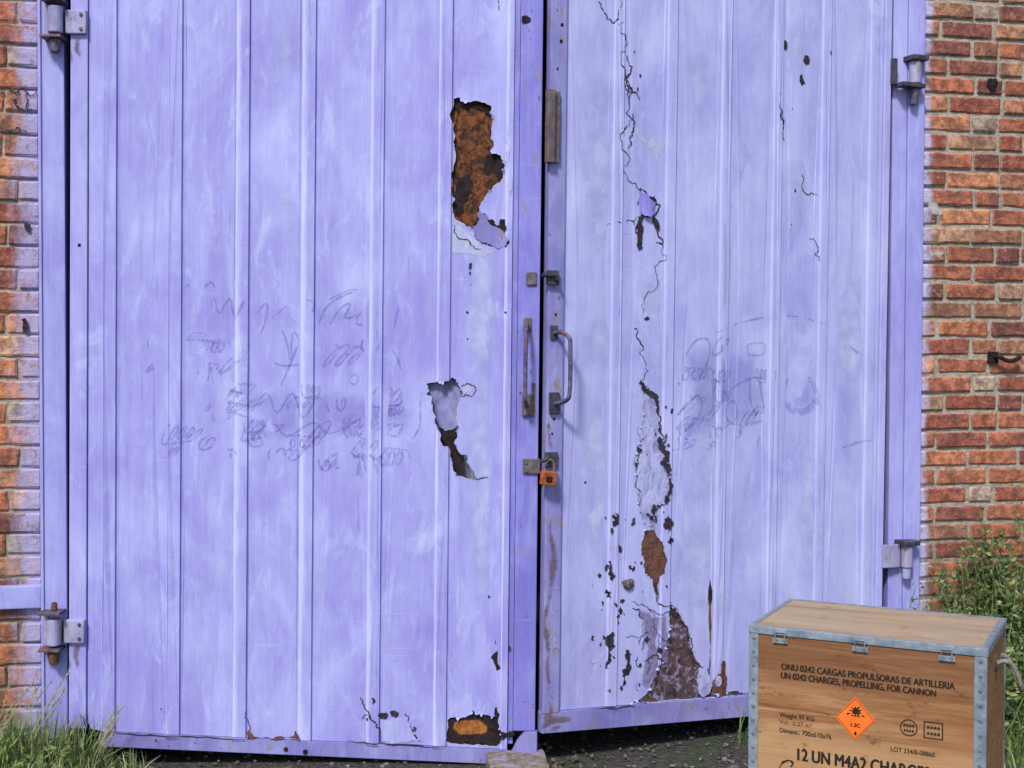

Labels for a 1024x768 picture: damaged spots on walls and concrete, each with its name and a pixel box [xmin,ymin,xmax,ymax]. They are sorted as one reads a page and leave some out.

peeling [467,211,509,249]
crack [598,1,667,389]
peeling [591,380,702,696]
corrosion [630,525,749,705]
corrosion [446,704,516,747]